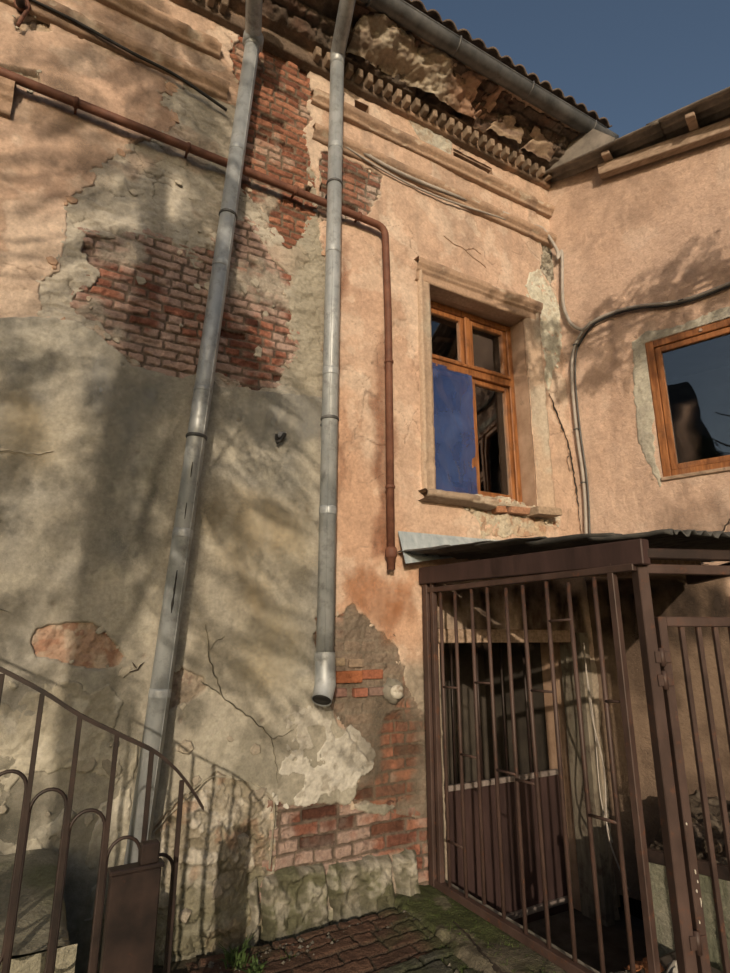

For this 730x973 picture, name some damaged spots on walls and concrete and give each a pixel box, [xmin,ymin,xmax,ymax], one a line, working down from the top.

flaking render [230,34,244,85]
flaking render [36,80,236,378]
flaking render [214,48,328,397]
flaking render [341,158,382,224]
peeling [409,120,452,154]
peeling [525,242,562,390]
crack [0,448,53,457]
crack [548,393,582,534]
peeling [0,680,138,921]
spalling [31,622,132,678]
crack [201,624,294,783]
spalling [258,604,429,903]